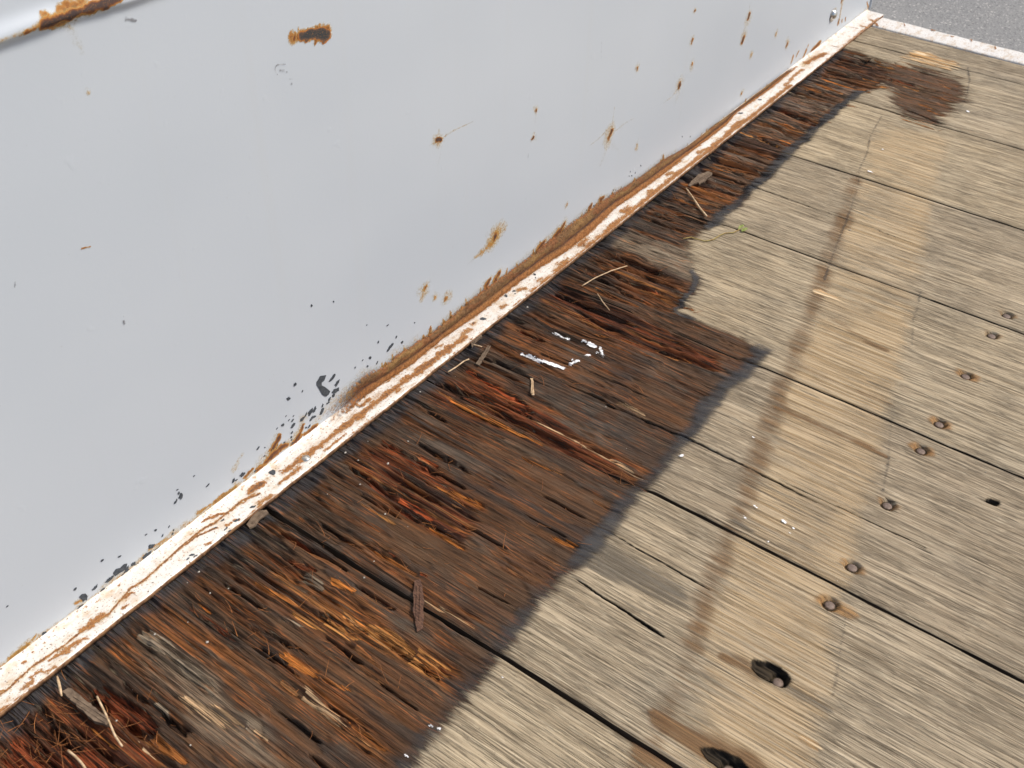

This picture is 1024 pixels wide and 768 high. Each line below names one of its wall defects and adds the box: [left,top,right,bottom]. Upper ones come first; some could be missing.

rust [2,0,123,41]
damp [705,90,865,228]
rust [107,0,879,587]
peeling [276,374,340,445]
damp [648,130,944,768]
peeling [73,525,174,609]
damp [570,469,687,607]
rust [0,612,105,713]
damp [632,744,673,768]